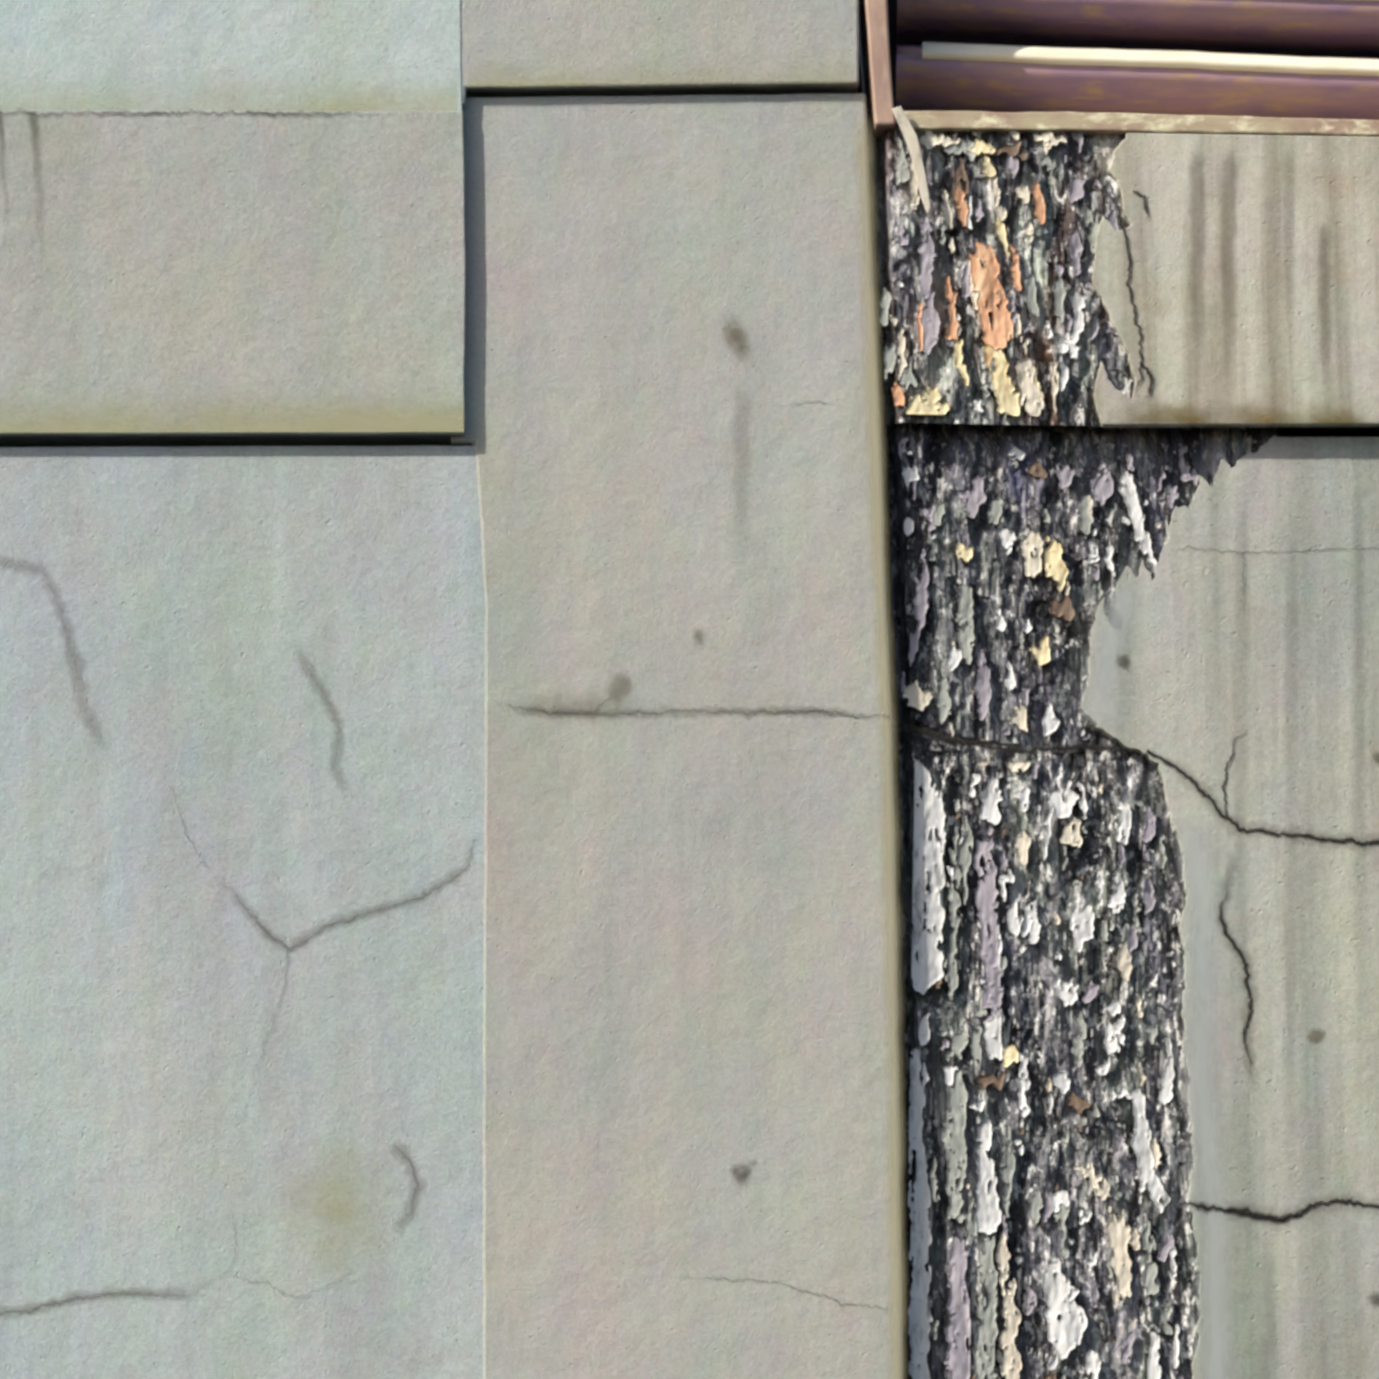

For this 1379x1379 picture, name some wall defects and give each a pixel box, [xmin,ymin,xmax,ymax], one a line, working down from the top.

spalling [876,121,1279,1379]
crack [892,719,1379,846]
crack [1219,903,1252,1050]
crack [1179,1199,1379,1222]